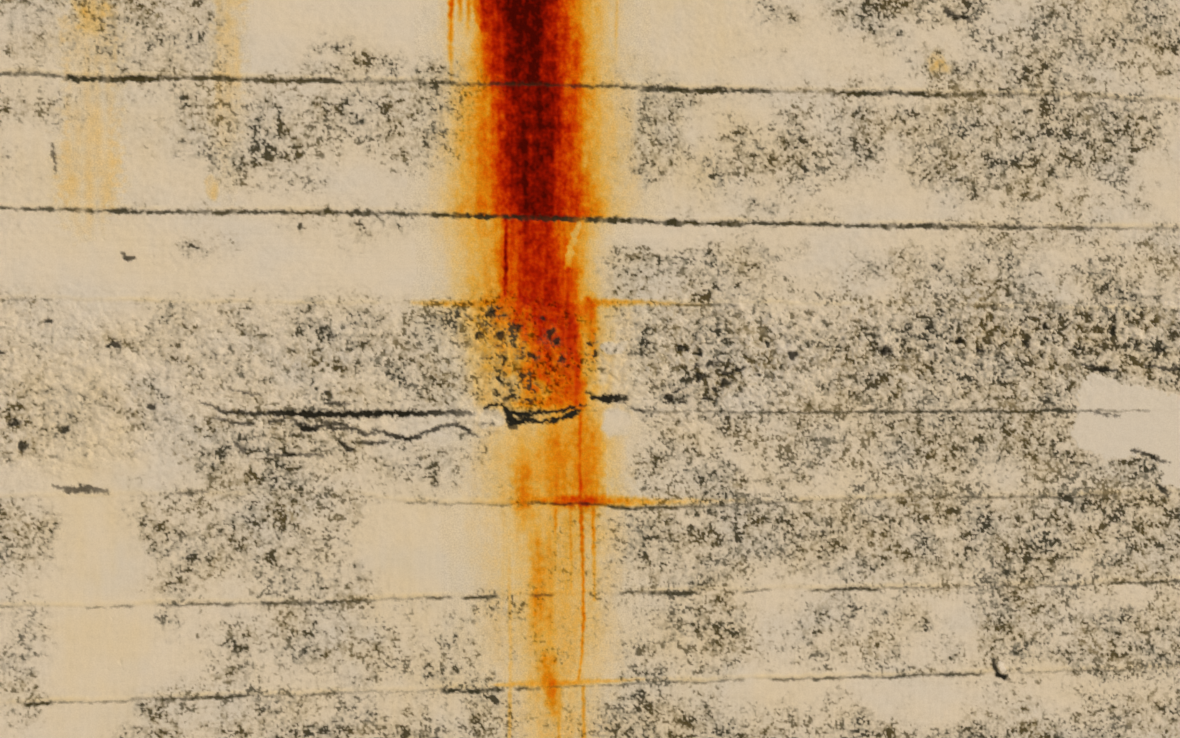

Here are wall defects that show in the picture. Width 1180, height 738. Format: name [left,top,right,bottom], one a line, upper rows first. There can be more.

leakage [629,0,1180,228]
leakage [0,0,502,738]
leakage [412,303,568,406]
rust [394,0,693,738]
spalling [842,293,991,371]
spalling [1002,297,1132,371]
spalling [1108,295,1180,365]
crack [196,387,1151,460]
leakage [593,225,1180,738]
crack [1129,447,1173,499]